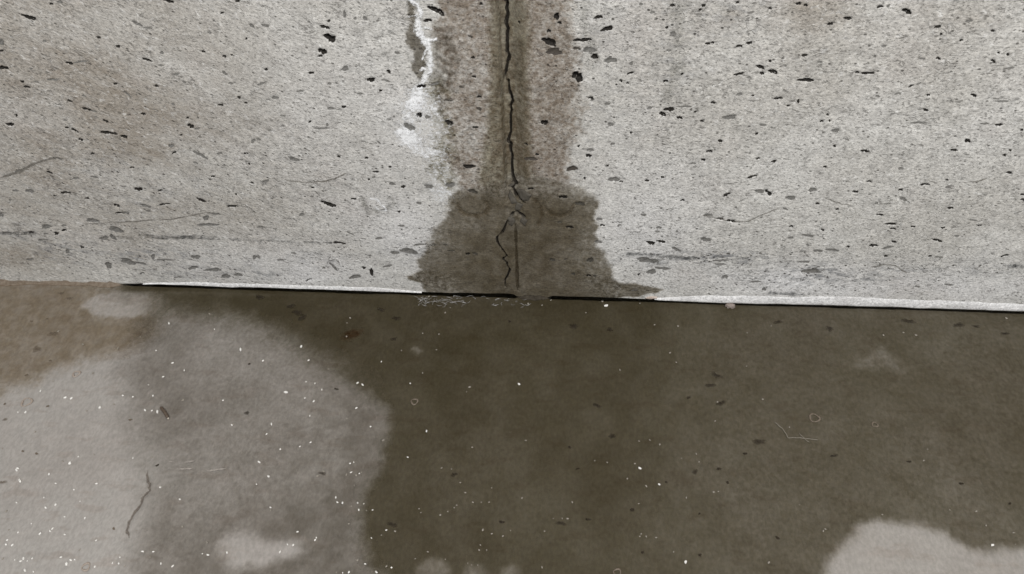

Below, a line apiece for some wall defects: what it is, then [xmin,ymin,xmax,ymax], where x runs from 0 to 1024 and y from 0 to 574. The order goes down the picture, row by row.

leakage [394,0,451,201]
crack [504,0,518,196]
crack [496,221,511,284]
leakage [123,185,1024,574]